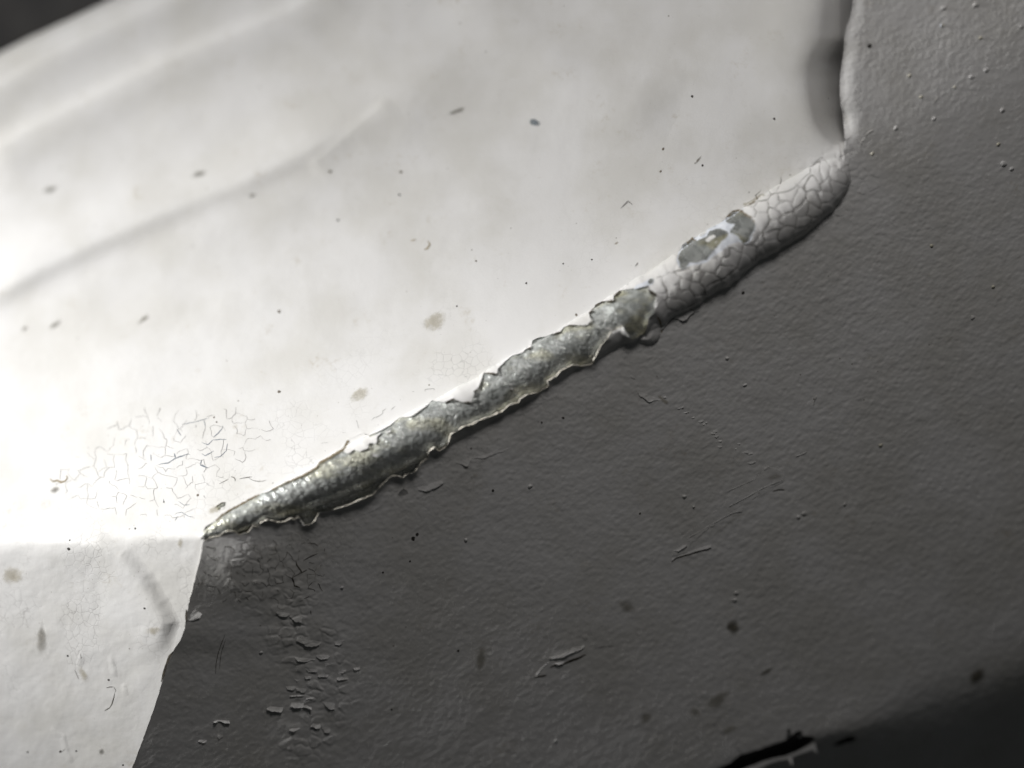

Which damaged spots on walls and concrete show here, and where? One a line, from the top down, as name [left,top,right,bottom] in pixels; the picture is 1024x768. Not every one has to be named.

crack [657,157,848,311]
crack [57,408,273,520]
peeling [185,609,202,623]
peeling [267,638,360,712]